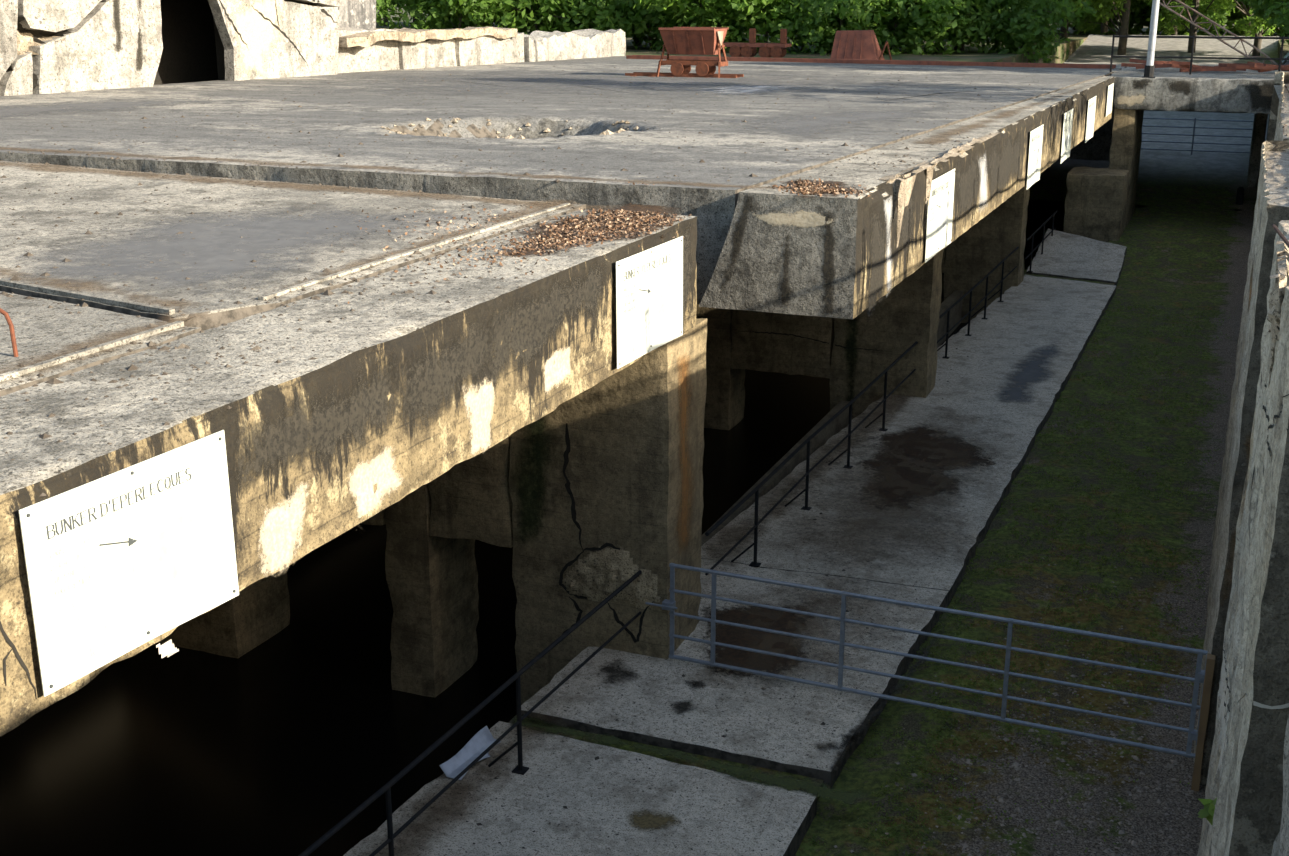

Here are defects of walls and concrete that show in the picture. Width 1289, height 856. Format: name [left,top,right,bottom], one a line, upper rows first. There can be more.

crack [6,0,106,87]
crack [219,0,337,70]
leakage [781,236,791,306]
leakage [822,213,835,313]
spalling [1260,224,1289,389]
leakage [714,316,996,558]
crack [1263,384,1289,461]
crack [559,423,654,643]
spalling [562,547,660,610]
crack [0,621,37,699]
leakage [750,585,873,670]